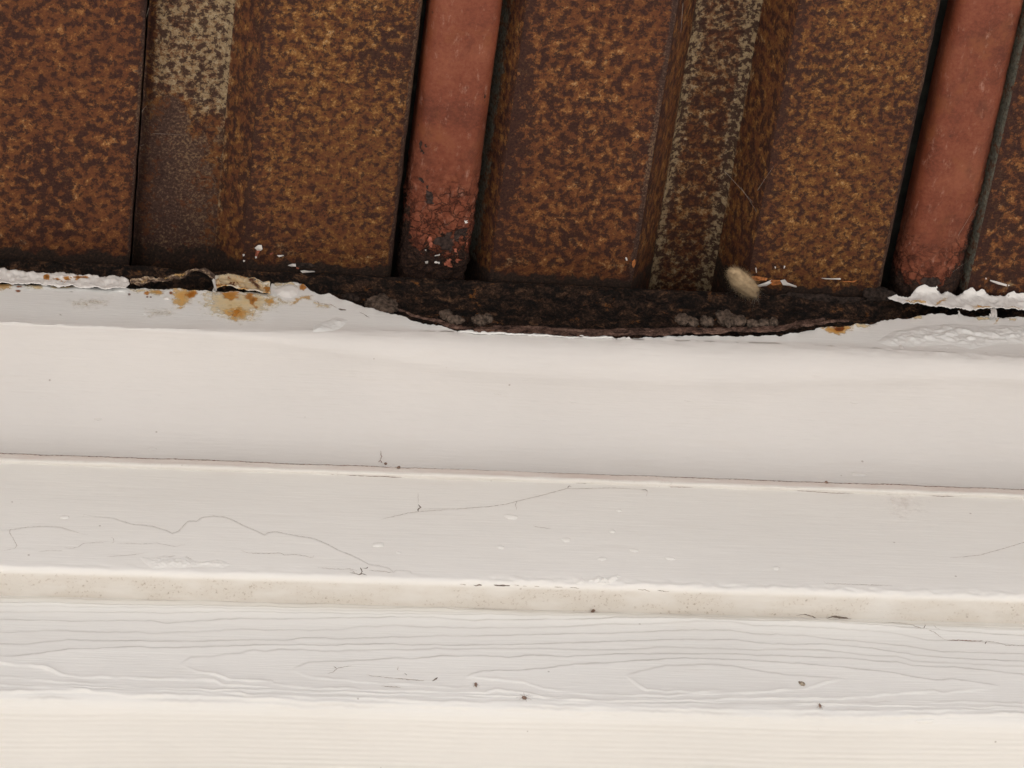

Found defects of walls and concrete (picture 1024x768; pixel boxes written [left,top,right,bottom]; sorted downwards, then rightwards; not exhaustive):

peeling [425,220,468,267]
corrosion [0,284,75,292]
peeling [0,245,315,294]
corrosion [128,288,328,321]
peeling [751,266,797,287]
peeling [888,277,1024,319]
crack [0,452,157,460]
crack [388,468,715,528]